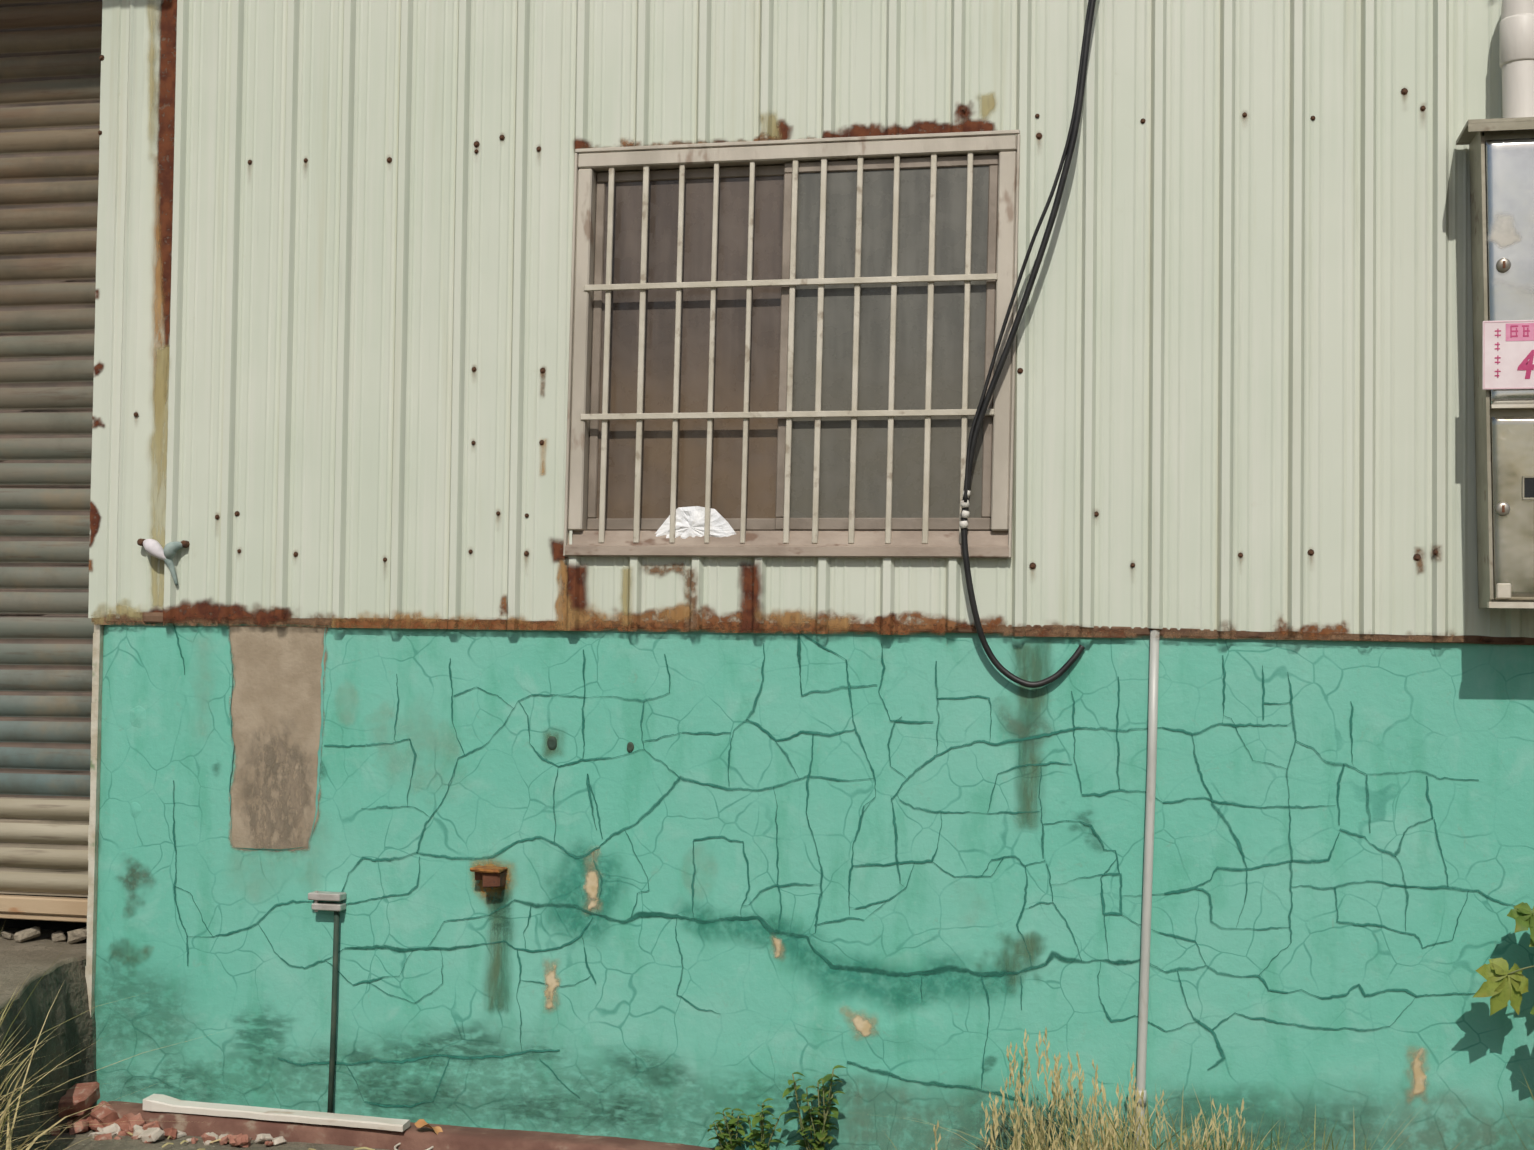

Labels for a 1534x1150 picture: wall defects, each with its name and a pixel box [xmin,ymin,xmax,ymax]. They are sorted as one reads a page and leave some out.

corrosion [574,94,995,153]
corrosion [149,0,177,494]
corrosion [94,513,1136,638]
crack [173,623,185,675]
corrosion [1262,619,1490,642]
leakage [1017,645,1046,823]
peeling [584,872,598,909]
crack [172,632,1532,1108]
peeling [545,965,559,1008]
peeling [853,1016,871,1036]
peeling [1413,1049,1426,1094]